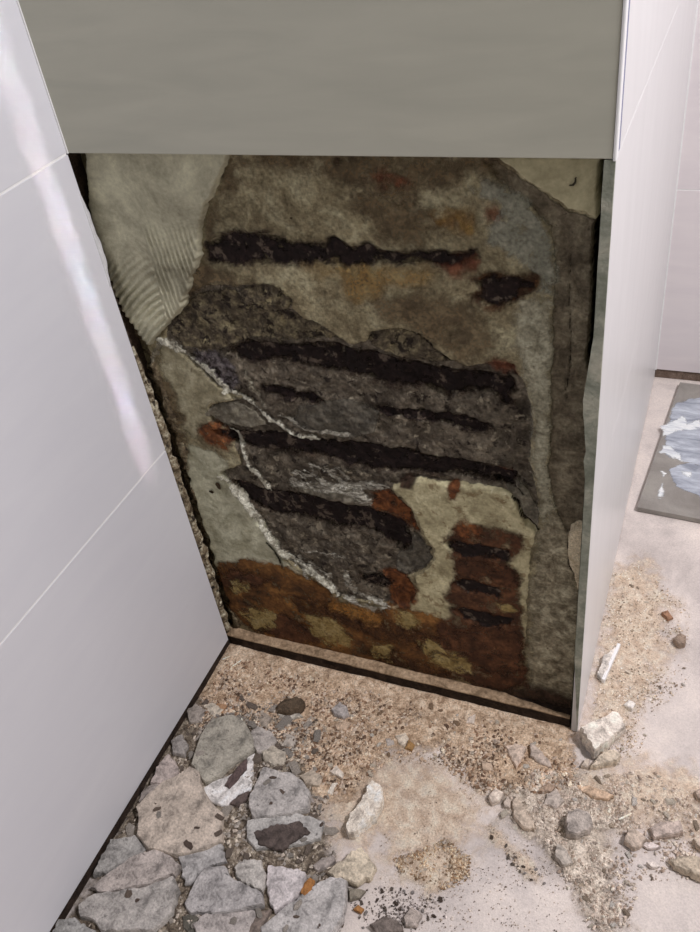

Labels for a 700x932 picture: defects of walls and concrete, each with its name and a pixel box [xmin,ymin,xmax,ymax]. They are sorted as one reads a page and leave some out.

corrosion [203,229,481,279]
corrosion [197,421,520,549]
spalling [148,161,597,699]
corrosion [230,339,517,405]
corrosion [376,404,496,434]
corrosion [217,521,529,691]